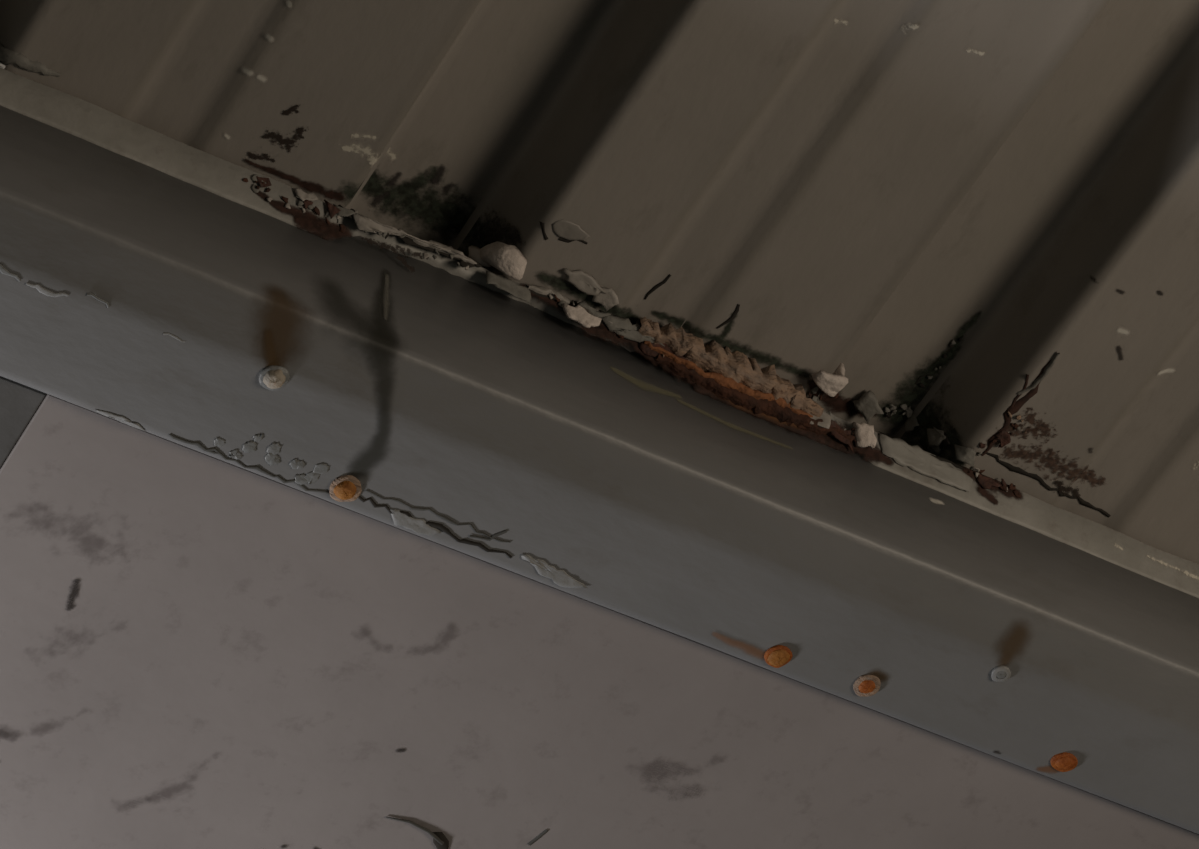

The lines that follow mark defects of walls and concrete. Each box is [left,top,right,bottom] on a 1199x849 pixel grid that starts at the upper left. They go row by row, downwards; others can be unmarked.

water stain [342,166,497,256]
peeling [333,204,664,346]
peeling [644,274,671,300]
peeling [716,304,740,329]
corrosion [599,317,893,465]
corrosion [1002,408,1106,497]